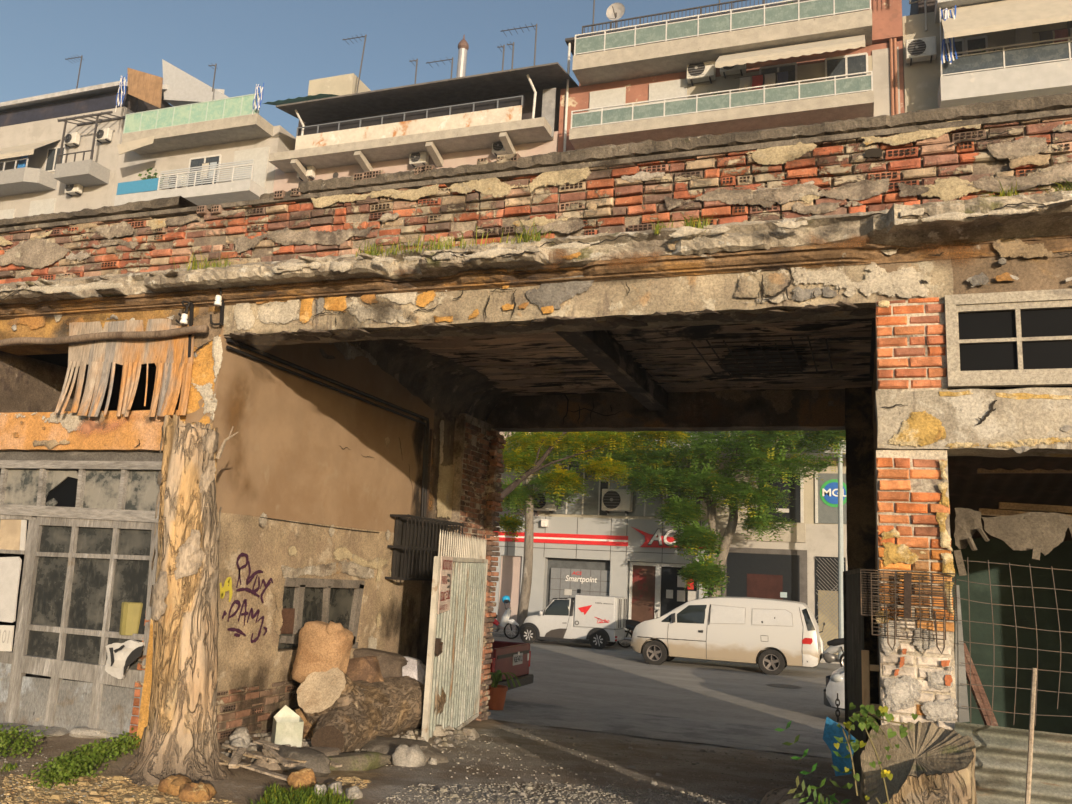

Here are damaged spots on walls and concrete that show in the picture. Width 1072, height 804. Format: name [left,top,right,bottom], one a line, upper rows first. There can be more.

flaking render [311,162,590,208]
flaking render [746,142,817,165]
flaking render [664,178,1072,225]
flaking render [861,120,981,158]
flaking render [960,136,1072,193]
flaking render [0,221,138,294]
flaking render [232,226,603,273]
flaking render [744,249,931,308]
flaking render [234,284,453,330]
leakage [372,302,393,320]
crack [977,400,997,425]
flaking render [889,410,1072,614]